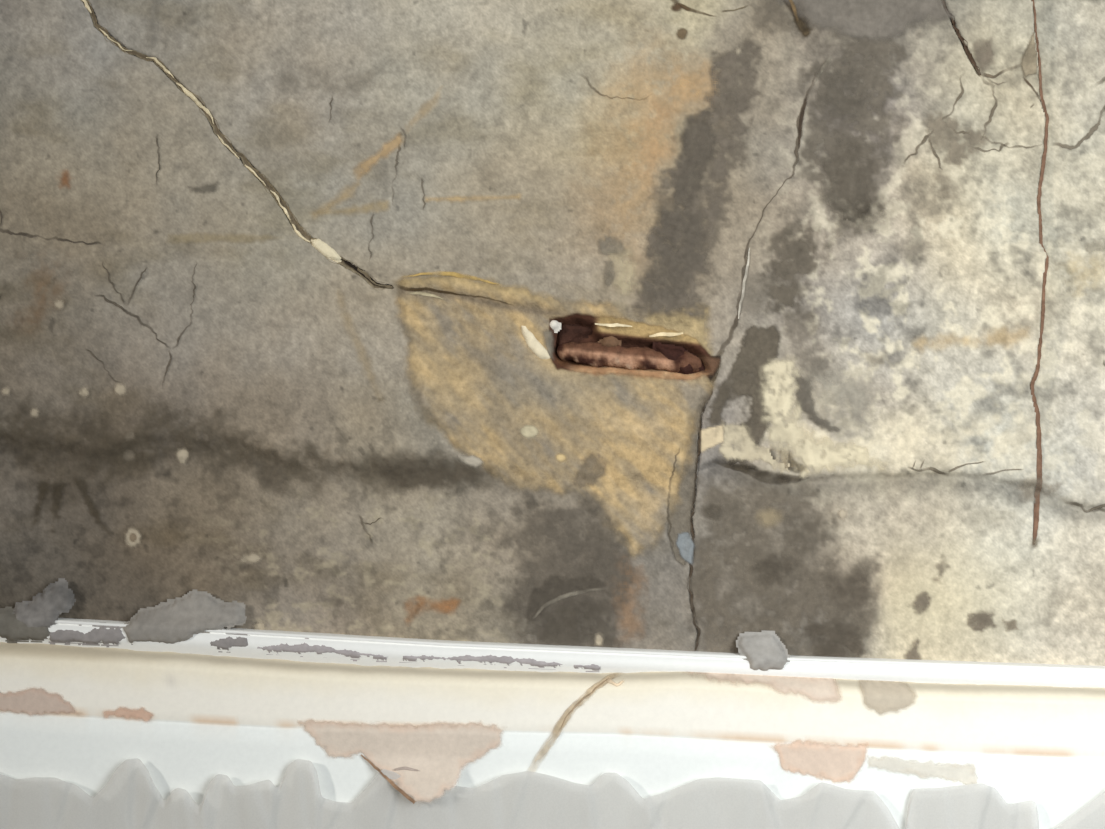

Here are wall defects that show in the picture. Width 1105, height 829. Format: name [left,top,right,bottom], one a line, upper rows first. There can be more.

crack [672,0,746,39]
crack [81,0,393,290]
water stain [636,42,760,317]
water stain [798,36,905,233]
water stain [763,228,830,311]
crack [906,0,1105,540]
crack [668,59,830,651]
water stain [576,455,604,487]
peeling [0,688,75,715]
peeling [104,707,152,721]
peeling [299,720,502,804]
peeling [774,740,977,785]